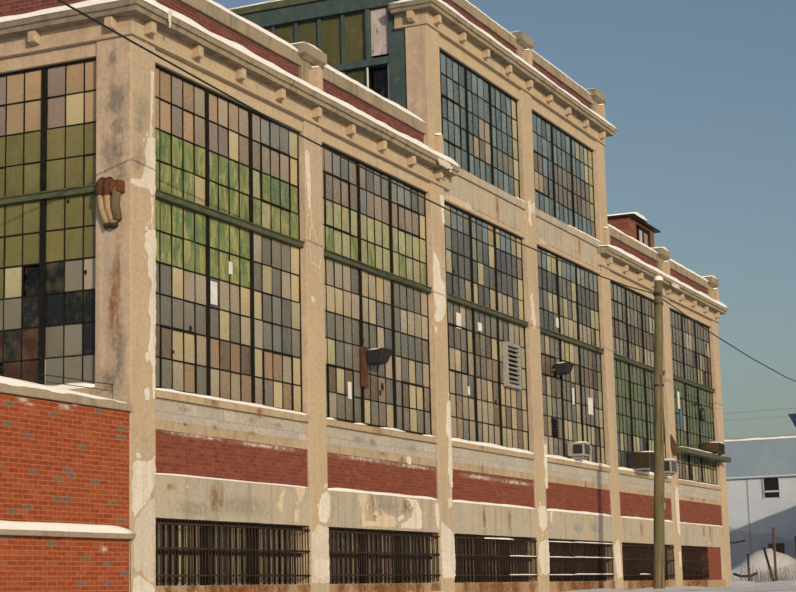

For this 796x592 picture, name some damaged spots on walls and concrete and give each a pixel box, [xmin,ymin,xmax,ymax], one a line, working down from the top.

peeling [130,71,157,401]
rust [110,263,119,328]
peeling [433,250,446,333]
peeling [132,453,156,516]
spalling [311,483,330,584]
spalling [358,494,422,529]
spalling [538,502,553,575]
spalling [133,575,155,592]
rust [572,581,602,590]